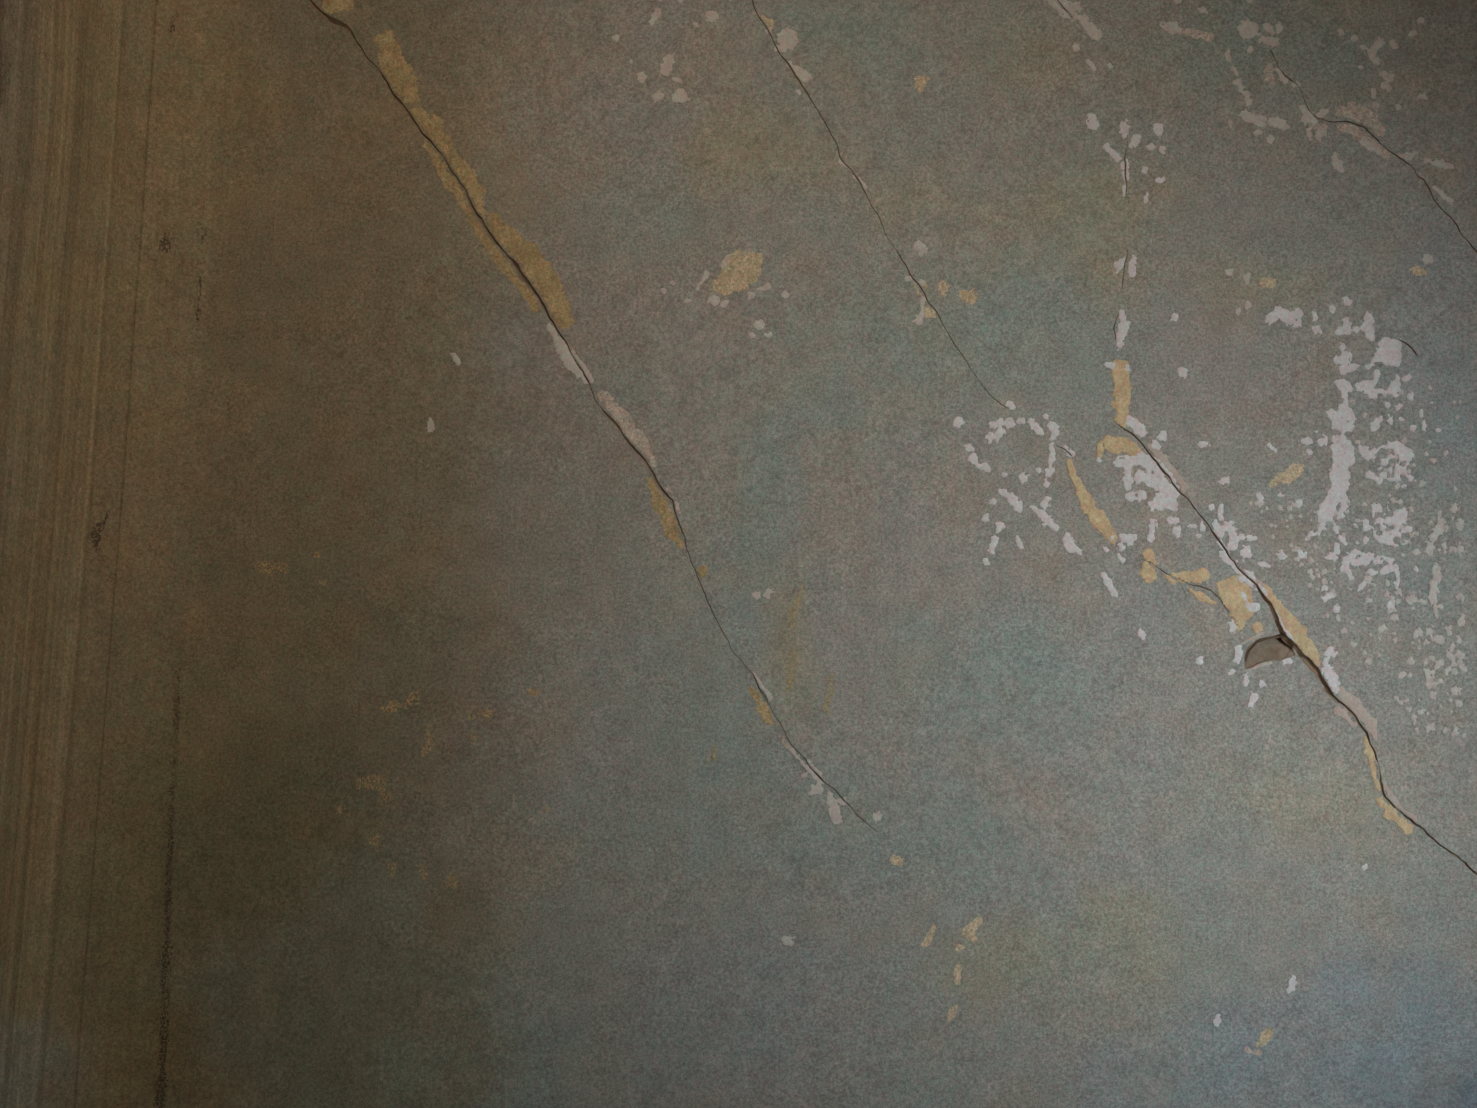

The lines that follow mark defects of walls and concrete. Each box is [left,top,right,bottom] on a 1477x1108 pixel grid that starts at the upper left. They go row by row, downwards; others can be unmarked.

peeling [629,52,690,104]
peeling [684,250,790,308]
crack [729,0,1006,408]
crack [1044,0,1113,71]
crack [1086,113,1166,203]
peeling [1237,0,1284,54]
crack [1165,26,1477,253]
crack [307,0,883,831]
peeling [952,401,1137,566]
peeling [1100,572,1118,597]
crack [1096,250,1477,875]
peeling [1224,268,1467,739]